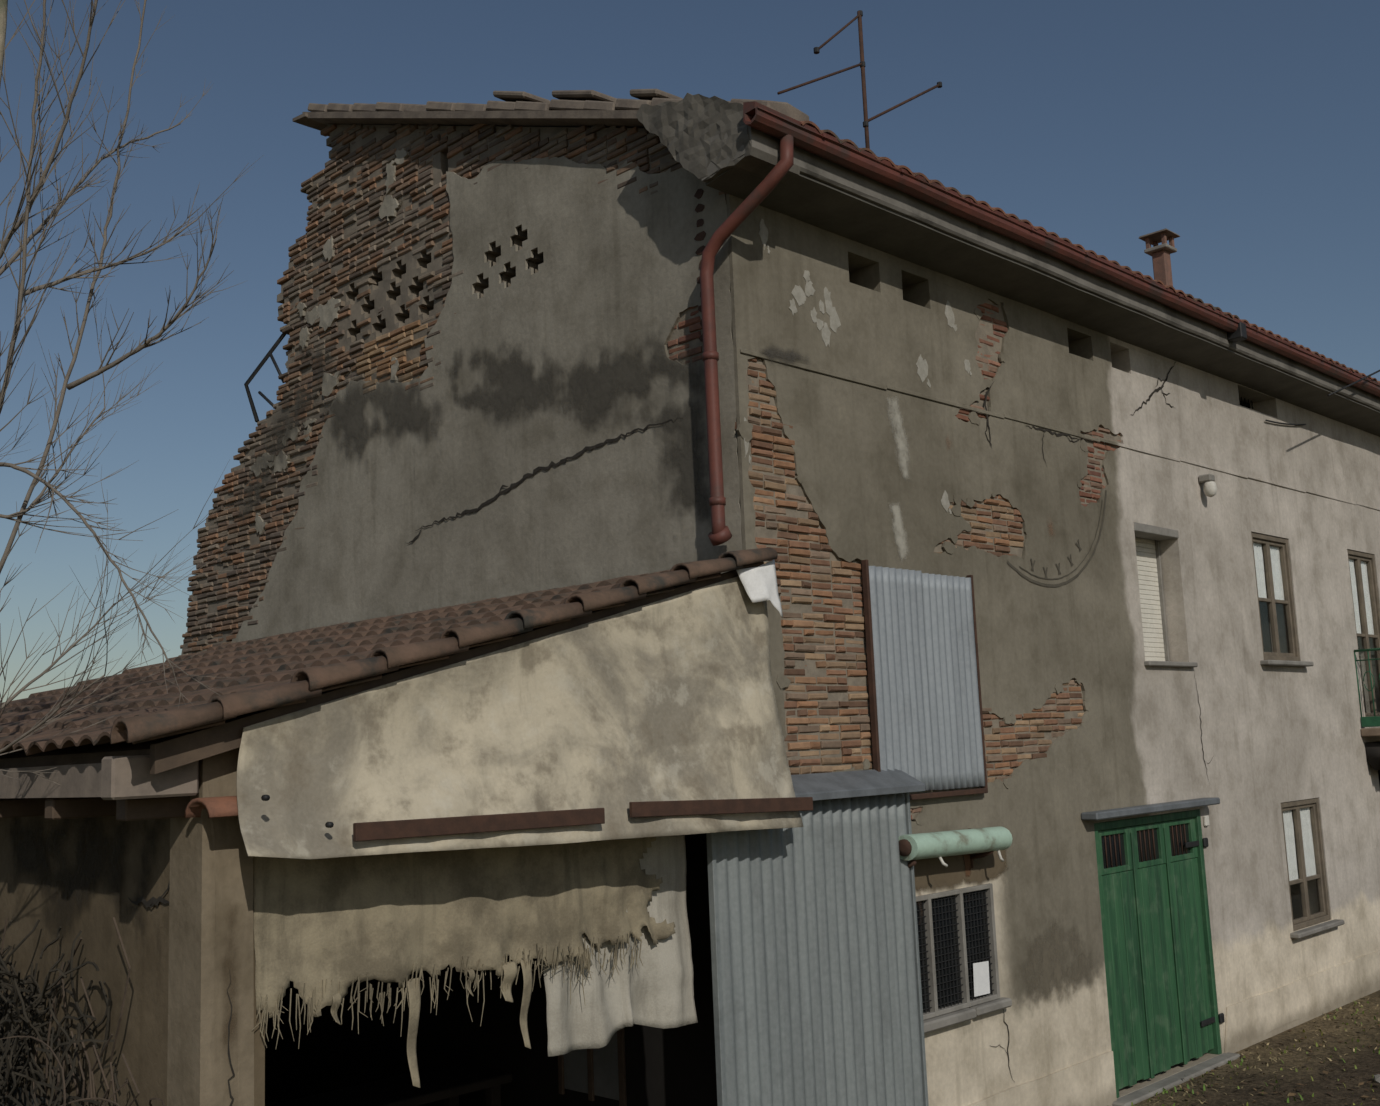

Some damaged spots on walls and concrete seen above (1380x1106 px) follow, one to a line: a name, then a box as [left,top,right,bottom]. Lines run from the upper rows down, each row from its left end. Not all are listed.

damp [326,383,440,455]
flaking render [179,123,682,656]
crack [407,417,678,544]
damp [454,346,710,518]
flaking render [735,357,873,775]
peeling [945,300,957,332]
flaking render [934,491,1025,557]
flaking render [955,299,1008,425]
flaking render [1077,427,1121,507]
crack [1130,362,1176,415]
flaking render [982,677,1091,789]
crack [992,1010,1012,1076]